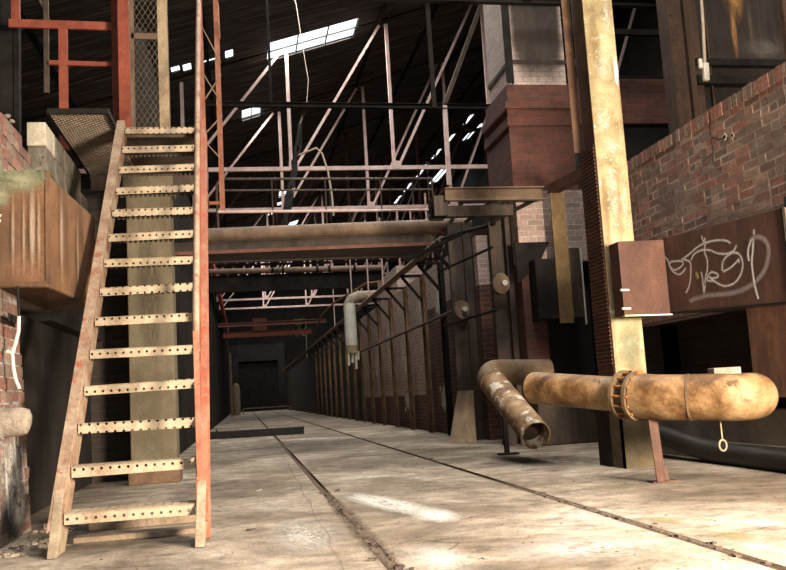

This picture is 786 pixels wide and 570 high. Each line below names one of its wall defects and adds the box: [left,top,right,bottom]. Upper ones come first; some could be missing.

peeling [588,50,618,85]
peeling [594,97,630,227]
rust [12,199,40,254]
leakage [2,443,29,537]